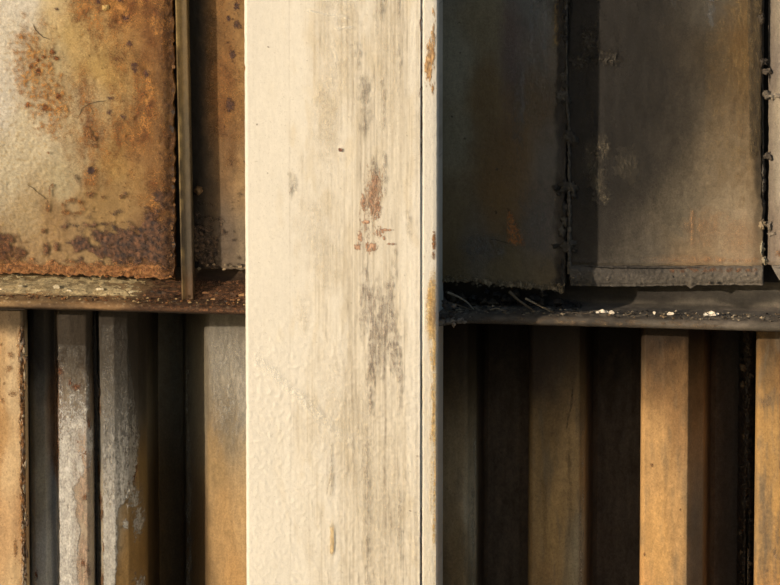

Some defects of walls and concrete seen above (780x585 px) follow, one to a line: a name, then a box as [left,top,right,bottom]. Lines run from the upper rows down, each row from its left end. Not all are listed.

rust [0,0,246,313]
peeling [58,385,145,585]